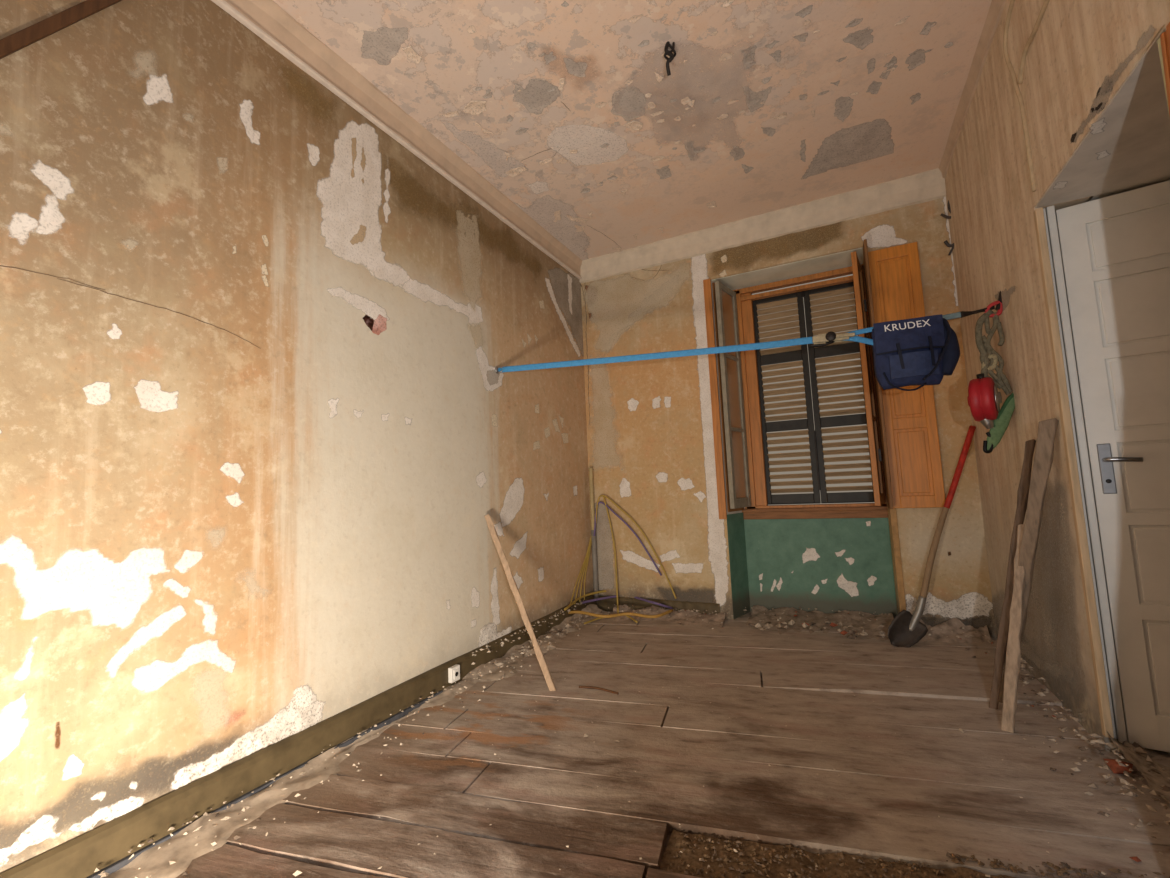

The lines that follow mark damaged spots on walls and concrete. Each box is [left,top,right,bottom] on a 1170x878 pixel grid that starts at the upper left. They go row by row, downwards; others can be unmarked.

peeling [361,27,408,65]
peeling [788,18,930,179]
peeling [36,195,65,235]
flaking render [307,121,410,286]
crack [0,265,261,349]
peeling [759,572,793,592]
peeling [802,548,820,563]
peeling [811,550,877,597]
water stain [0,781,145,866]